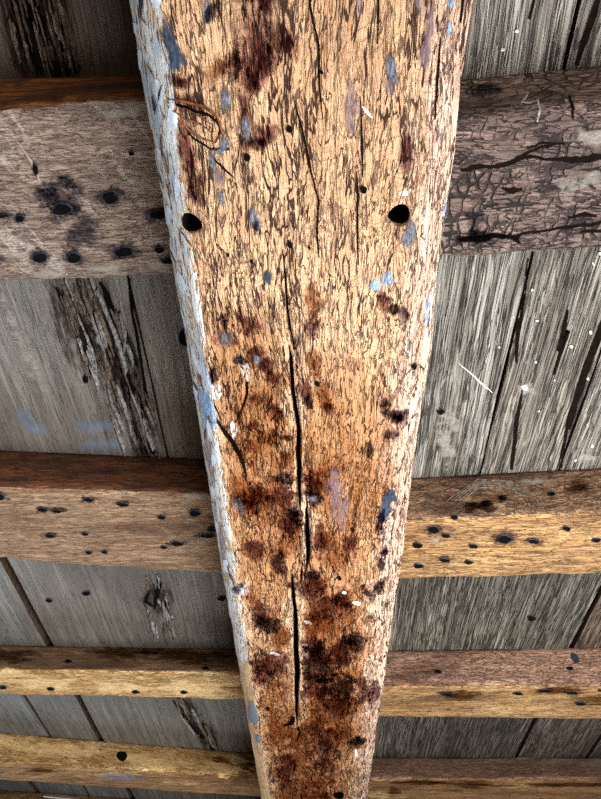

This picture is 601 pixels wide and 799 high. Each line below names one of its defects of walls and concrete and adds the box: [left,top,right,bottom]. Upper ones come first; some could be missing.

damp [224,0,296,151]
damp [248,347,278,384]
damp [299,382,313,409]
damp [230,472,324,536]
crack [283,256,310,741]
damp [375,489,398,535]
damp [244,541,285,574]
damp [249,603,281,635]
damp [288,570,353,622]
damp [361,581,385,600]
damp [250,653,292,686]
damp [301,632,381,774]